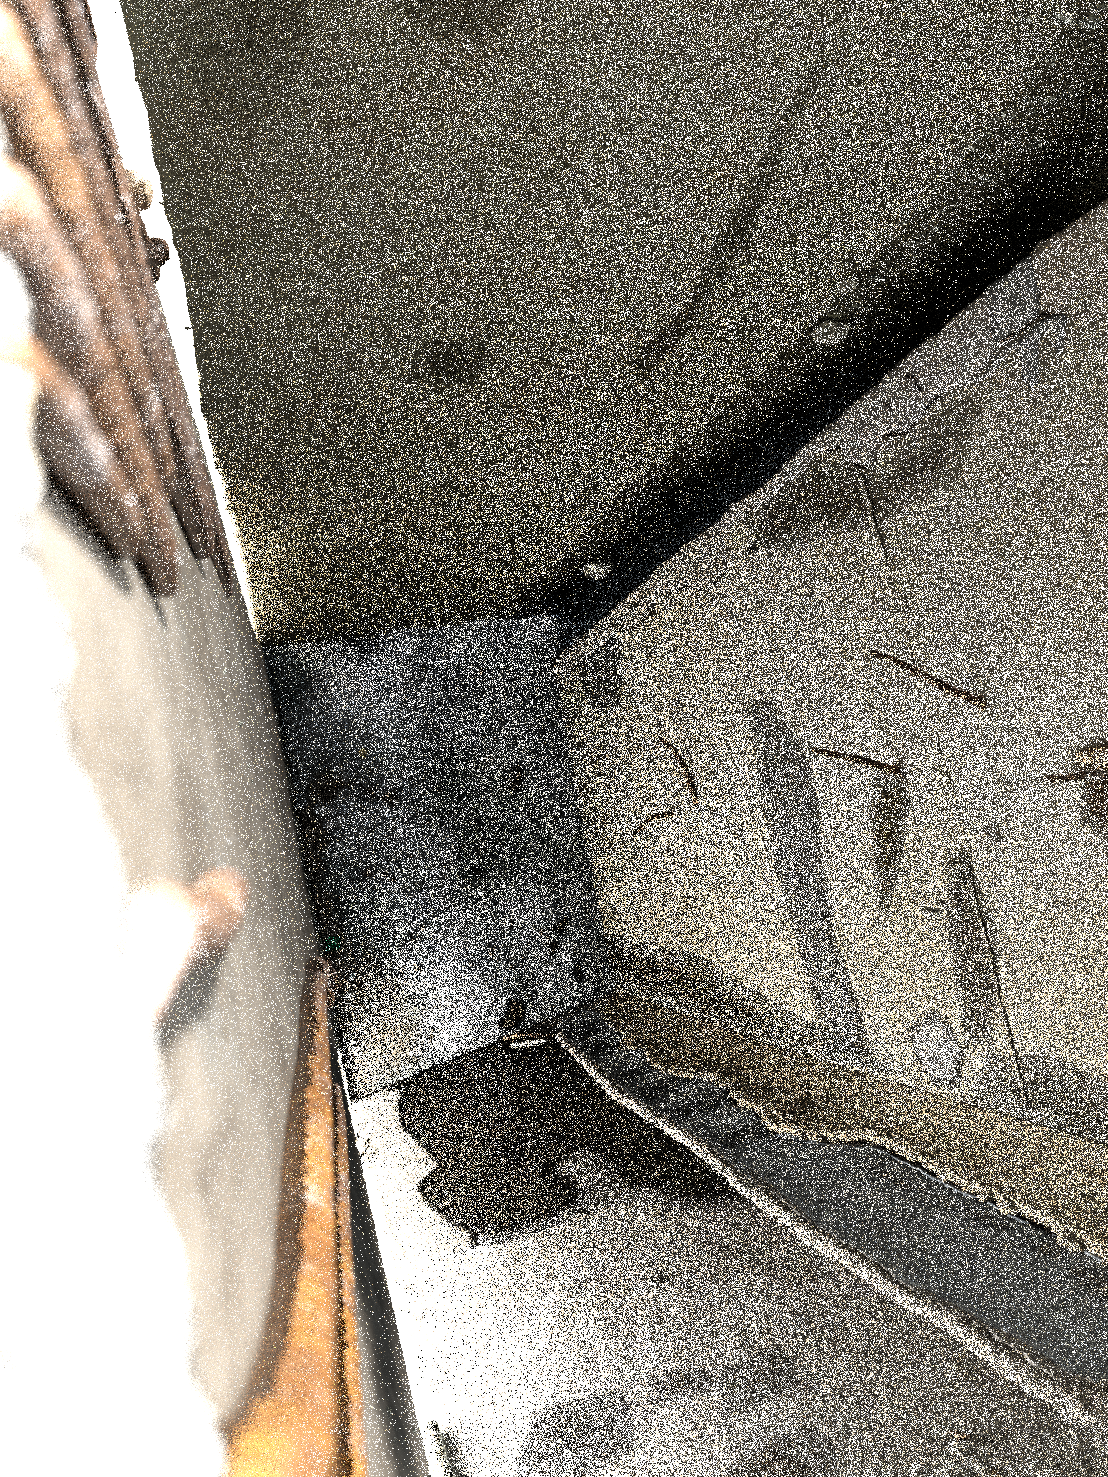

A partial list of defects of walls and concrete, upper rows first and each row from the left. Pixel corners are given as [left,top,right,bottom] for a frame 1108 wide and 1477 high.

rust [0,0,233,599]
spalling [736,199,1108,511]
spalling [553,525,727,683]
rust [878,791,902,872]
rust [1080,763,1108,825]
rust [115,868,249,1030]
damp [400,1032,743,1235]
peeling [680,1078,709,1092]
rust [214,956,368,1477]
spalling [910,1417,1108,1477]